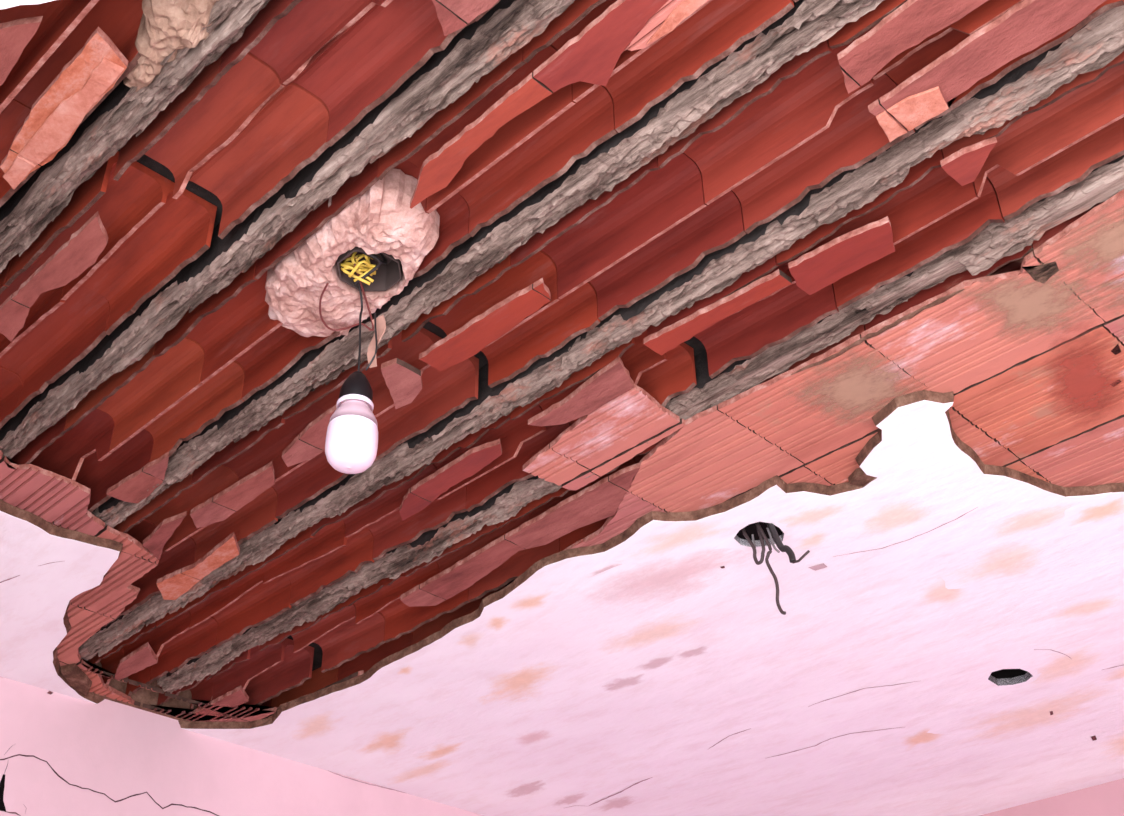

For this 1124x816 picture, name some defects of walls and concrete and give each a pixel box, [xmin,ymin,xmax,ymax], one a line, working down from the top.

peeling [646,0,708,45]
peeling [3,57,124,189]
peeling [876,86,949,142]
flaking render [0,499,123,557]
flaking render [178,390,1124,729]
flaking render [63,601,71,633]
flaking render [53,647,104,704]